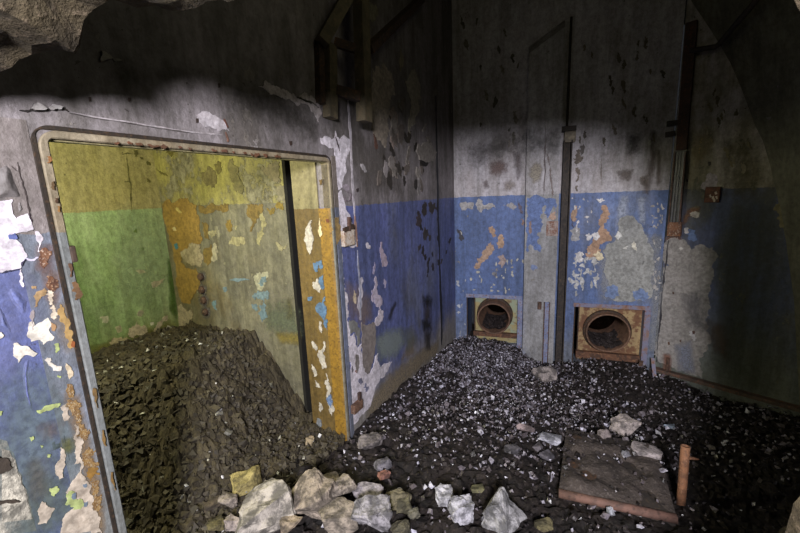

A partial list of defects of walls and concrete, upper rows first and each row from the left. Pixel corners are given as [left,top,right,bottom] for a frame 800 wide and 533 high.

peeling [0,199,75,379]
rust [39,247,59,319]
peeling [177,304,194,326]
peeling [174,222,219,267]
spalling [197,111,229,142]
spalling [201,158,244,194]
spalling [225,160,285,246]
peeling [304,131,392,427]
peeling [456,194,557,294]
peeling [568,131,718,378]
water stain [641,132,660,193]
rust [66,384,102,525]